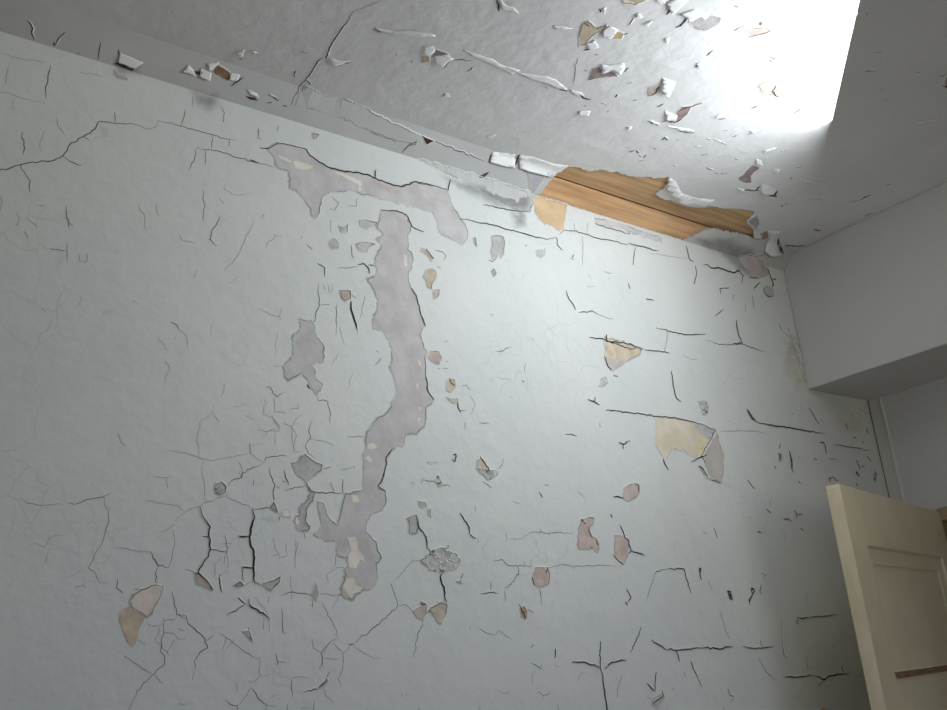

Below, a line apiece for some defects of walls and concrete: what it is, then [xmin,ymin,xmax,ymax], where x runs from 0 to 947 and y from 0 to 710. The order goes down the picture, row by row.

flaking render [183,62,259,101]
crack [0,3,451,268]
peeling [587,63,628,81]
peeling [663,103,702,123]
crack [630,130,739,174]
peeling [416,158,568,232]
crack [179,187,380,386]
peeling [266,132,478,602]
crack [426,341,489,424]
peeling [603,337,643,371]
crack [26,340,463,710]
crack [470,484,850,710]